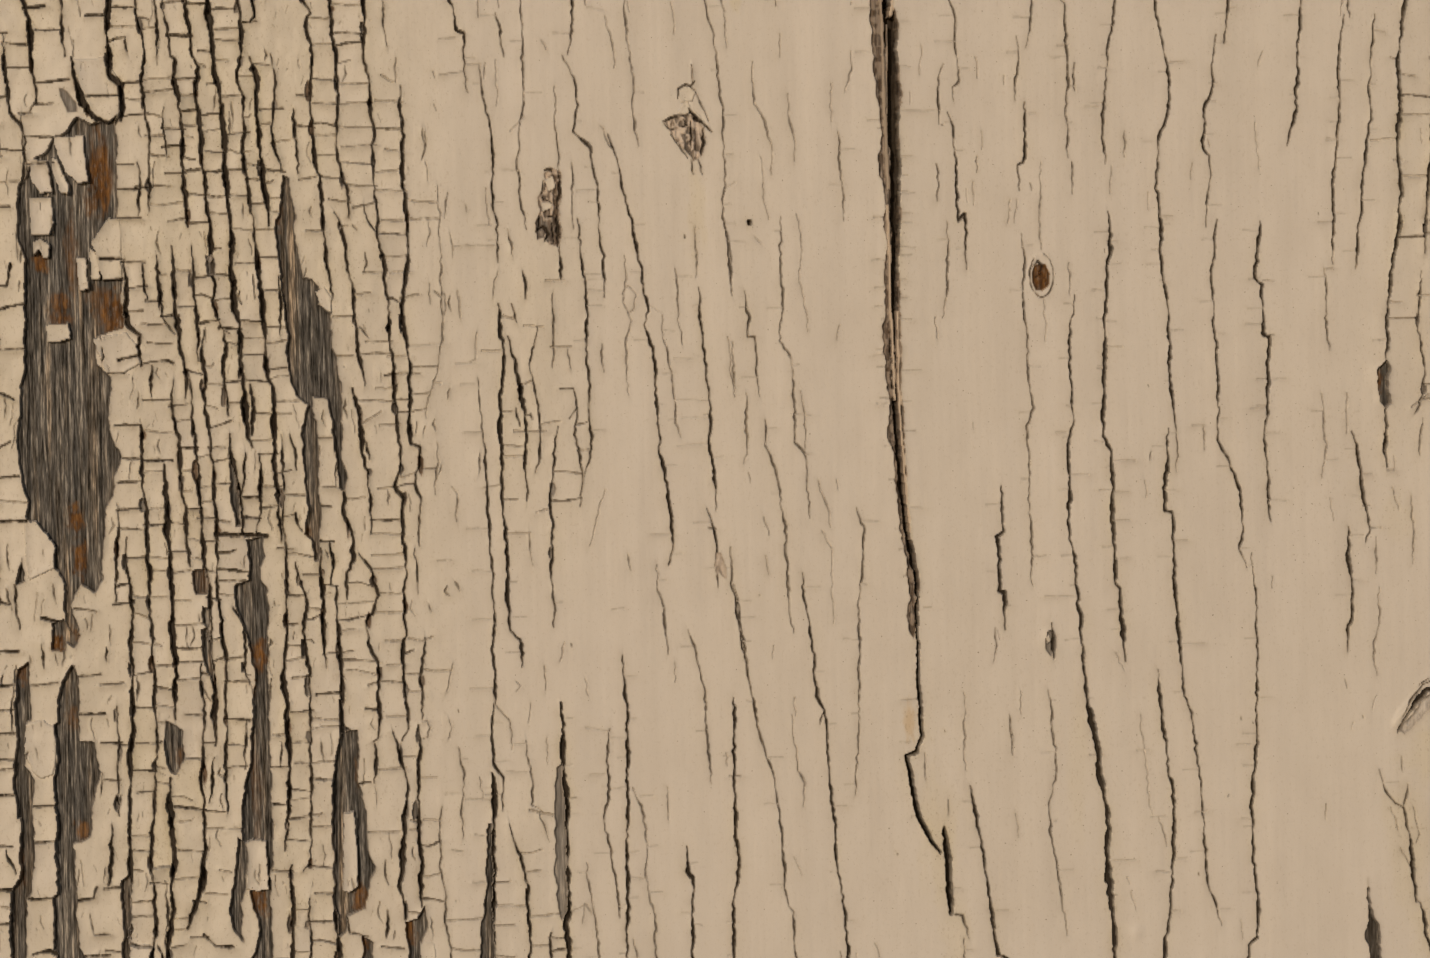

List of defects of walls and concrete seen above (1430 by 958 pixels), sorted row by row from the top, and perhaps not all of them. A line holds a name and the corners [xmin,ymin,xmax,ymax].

peeling [8,57,141,958]
peeling [274,175,349,562]
crack [0,0,881,958]
crack [901,0,1430,958]